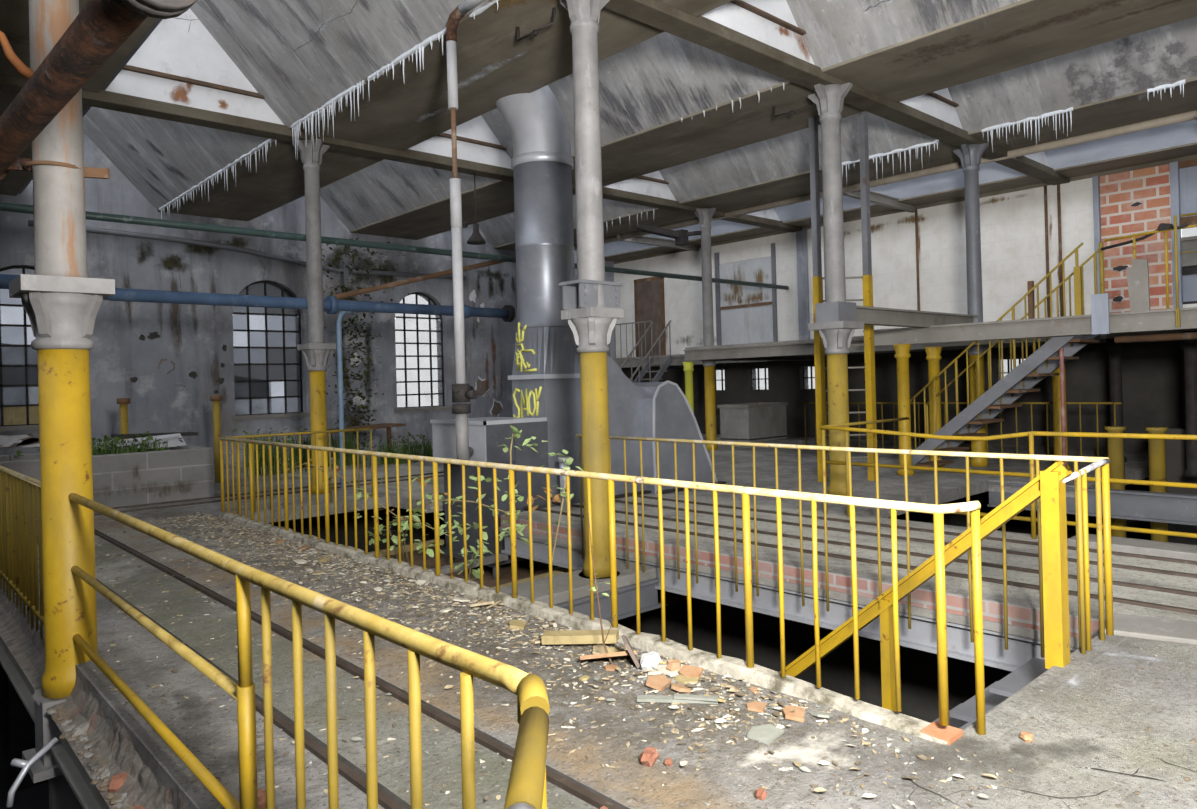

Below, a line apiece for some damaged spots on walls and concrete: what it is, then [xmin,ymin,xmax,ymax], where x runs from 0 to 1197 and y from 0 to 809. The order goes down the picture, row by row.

damp [914,0,1117,53]
corrosion [172,83,192,102]
damp [981,39,1197,150]
crack [905,758,1196,809]